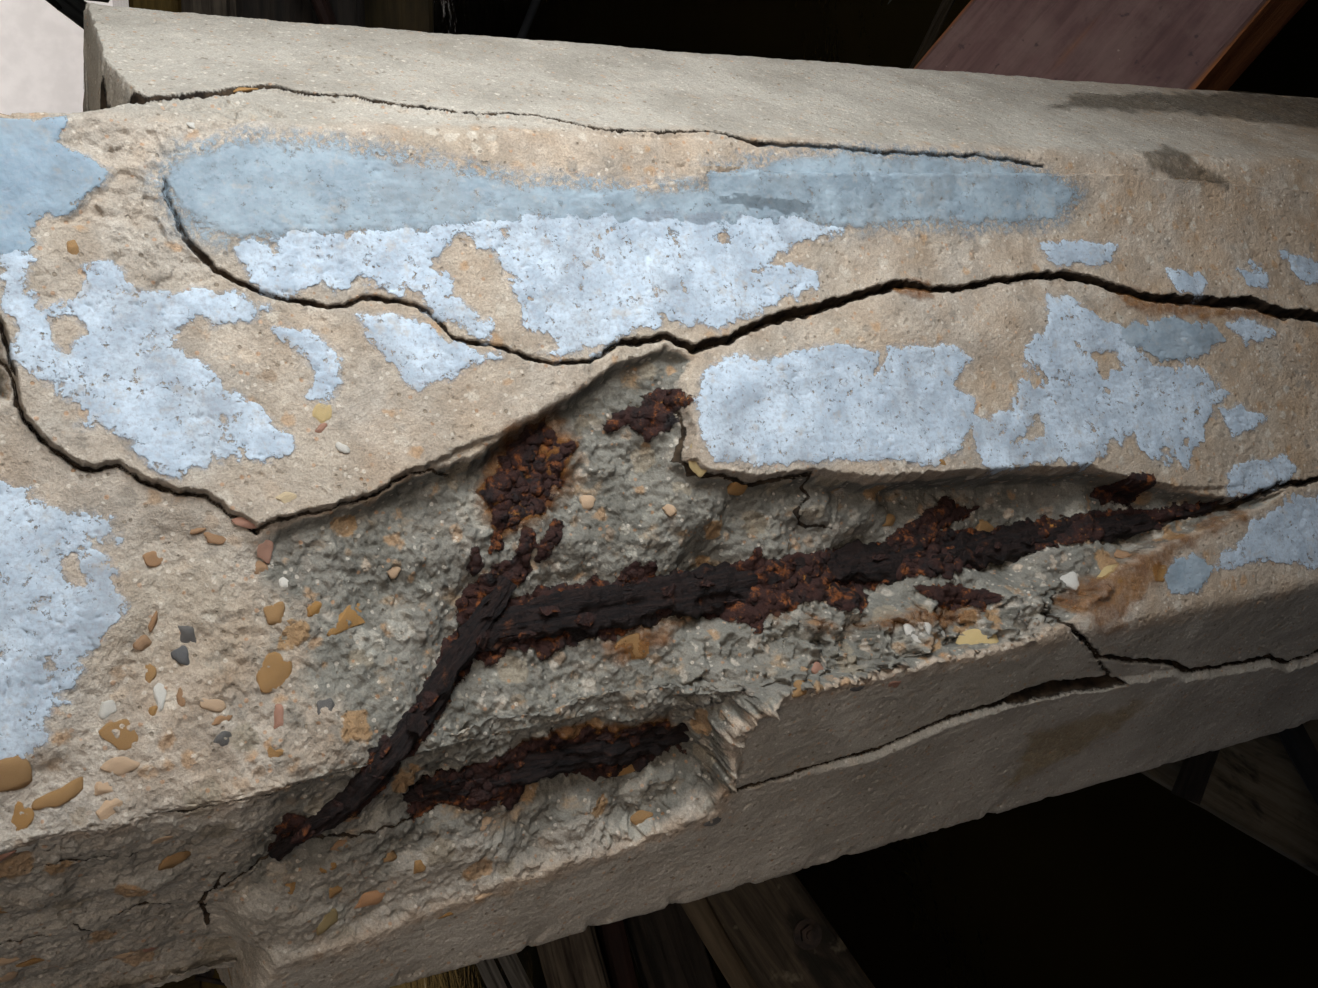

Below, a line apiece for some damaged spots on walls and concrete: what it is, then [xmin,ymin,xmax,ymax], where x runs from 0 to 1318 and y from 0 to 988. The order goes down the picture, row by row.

crack [100,76,1043,168]
peeling [0,3,1084,480]
crack [162,178,1318,366]
peeling [1040,239,1118,267]
peeling [1165,267,1208,305]
peeling [1280,250,1318,285]
crack [0,322,448,535]
corrosion [603,388,696,443]
crack [1150,477,1318,531]
spalling [0,292,1318,988]
corrosion [268,411,1247,862]
crack [730,602,1318,793]